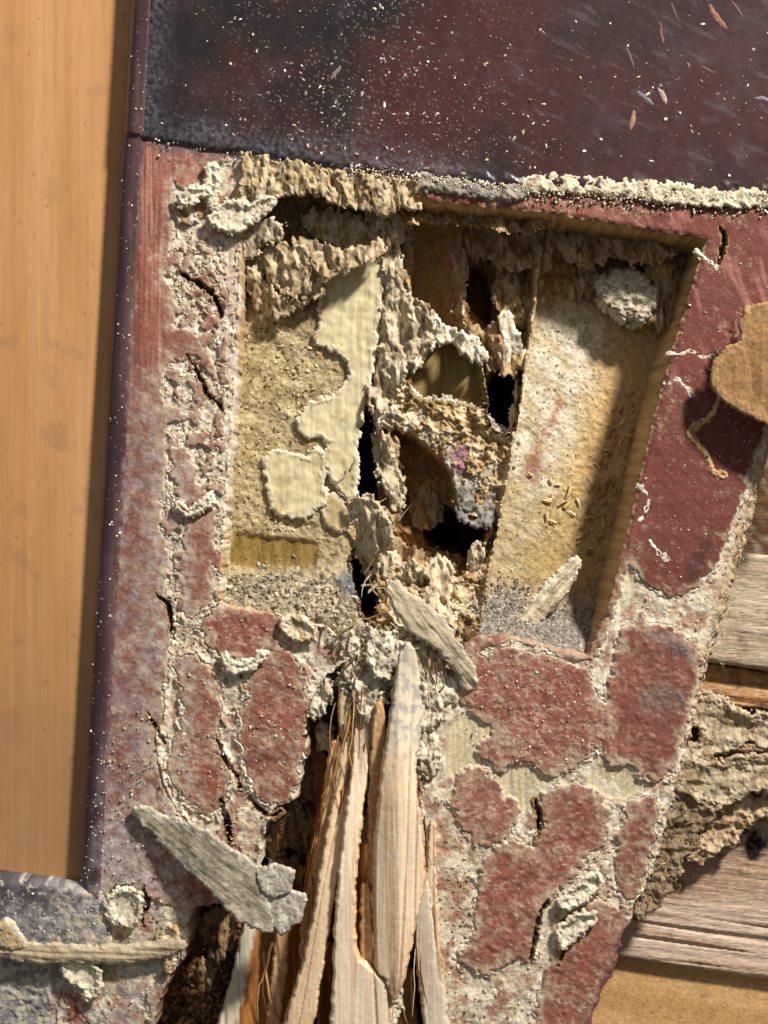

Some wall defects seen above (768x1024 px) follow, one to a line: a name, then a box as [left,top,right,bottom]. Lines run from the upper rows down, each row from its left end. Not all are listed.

crack [177,269,225,321]
crack [184,353,225,414]
spalling [155,151,768,1024]
crack [145,711,166,745]
crack [530,796,546,840]
crack [528,897,571,969]